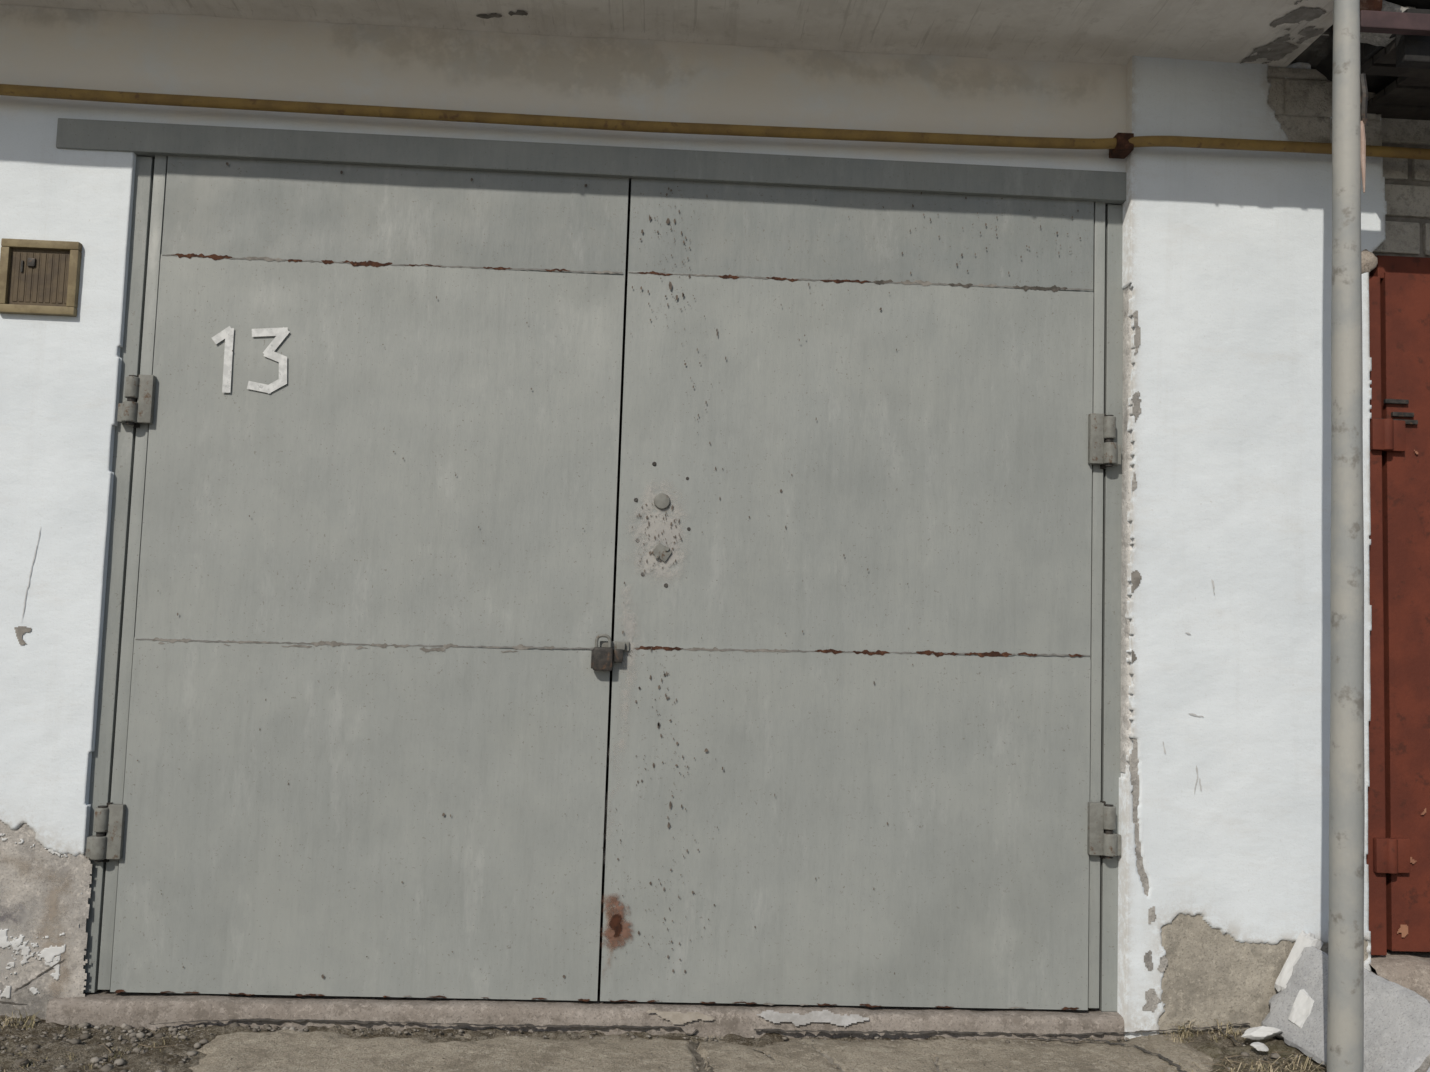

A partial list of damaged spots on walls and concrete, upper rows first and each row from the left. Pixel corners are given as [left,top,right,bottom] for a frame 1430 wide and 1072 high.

rust [632,186,695,329]
rust [632,503,682,573]
rust [627,647,723,786]
flaking render [1120,285,1295,1035]
damp [0,876,68,991]
flaking render [0,820,92,1020]
rust [603,791,715,973]